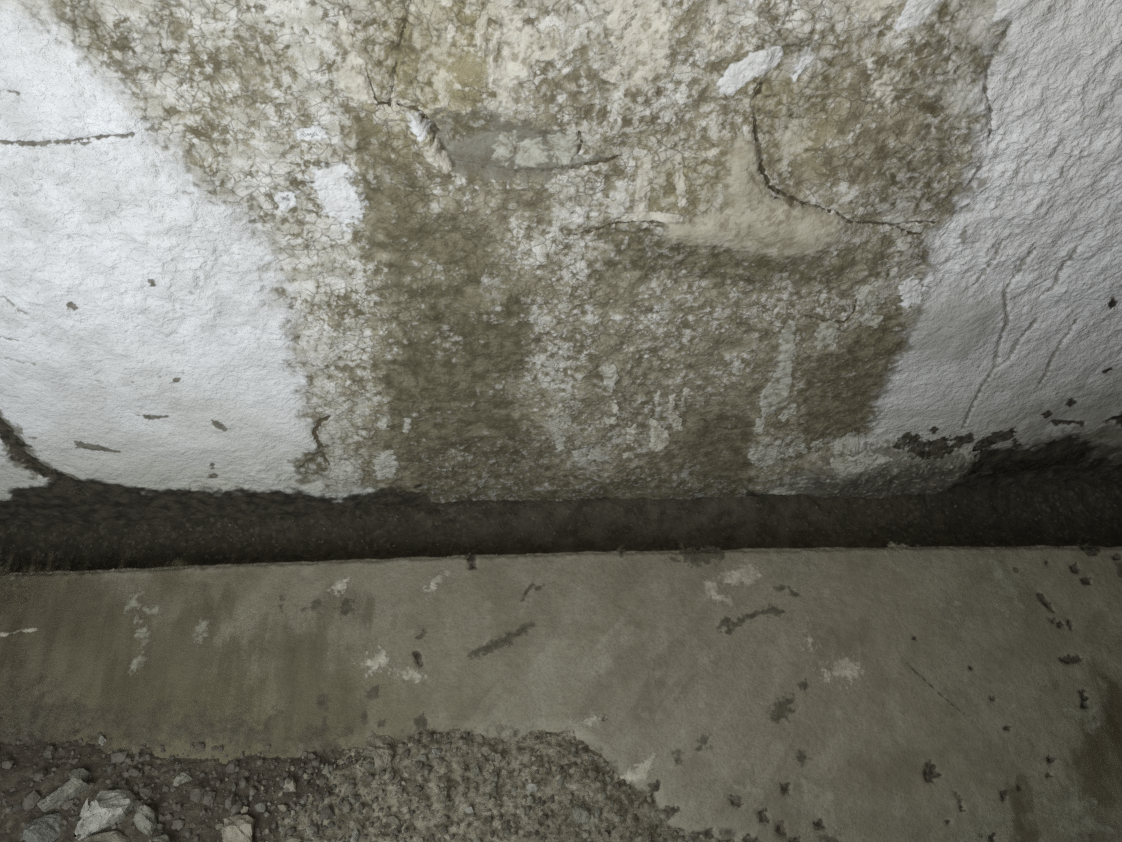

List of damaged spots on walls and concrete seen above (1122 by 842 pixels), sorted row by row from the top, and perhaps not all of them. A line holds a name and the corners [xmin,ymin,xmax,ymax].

crack [0,133,135,147]
crack [364,0,486,168]
crack [515,131,622,173]
crack [752,83,936,235]
damp [0,0,1122,526]
crack [0,412,94,501]